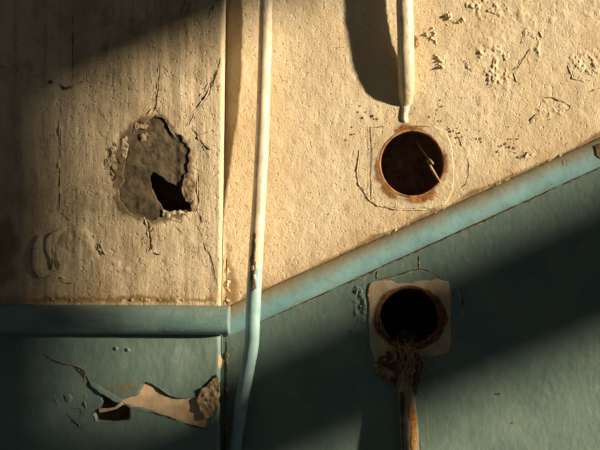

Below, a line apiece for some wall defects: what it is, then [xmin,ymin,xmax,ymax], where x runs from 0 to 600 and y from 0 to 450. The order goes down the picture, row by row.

crack [145,57,222,158]
flaking render [106,115,196,223]
rust [375,149,397,199]
rust [408,189,436,203]
peeling [89,352,222,431]
rust [409,401,417,450]